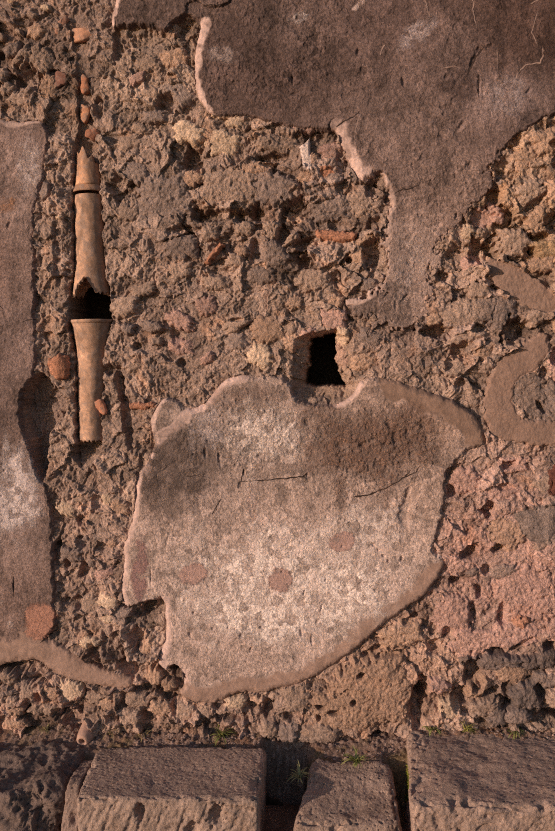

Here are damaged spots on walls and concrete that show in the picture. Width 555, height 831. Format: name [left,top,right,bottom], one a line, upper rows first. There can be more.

spalling [0,0,426,675]
spalling [379,116,555,641]